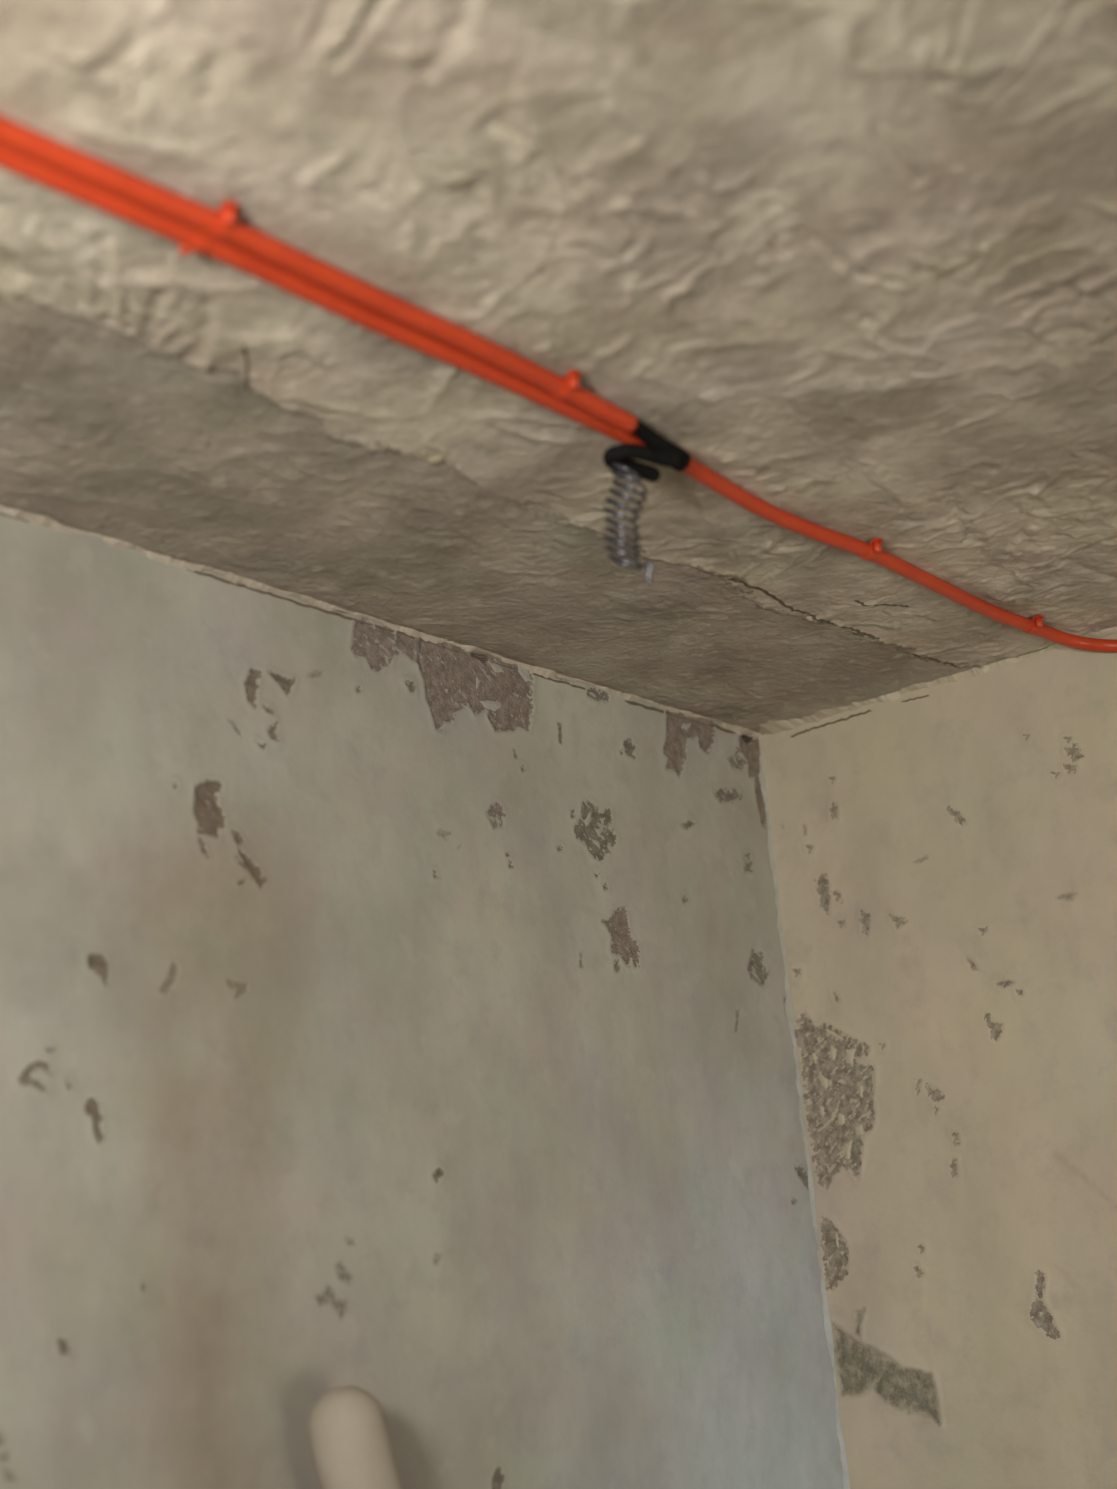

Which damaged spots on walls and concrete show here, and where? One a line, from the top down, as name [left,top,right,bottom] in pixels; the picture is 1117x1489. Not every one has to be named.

peeling [0,293,979,829]
crack [727,577,909,639]
crack [790,654,963,738]
flaking render [193,780,267,887]
flaking render [557,800,617,890]
flaking render [601,906,640,972]
flaking render [792,1013,885,1205]
flaking render [1030,1270,1060,1339]